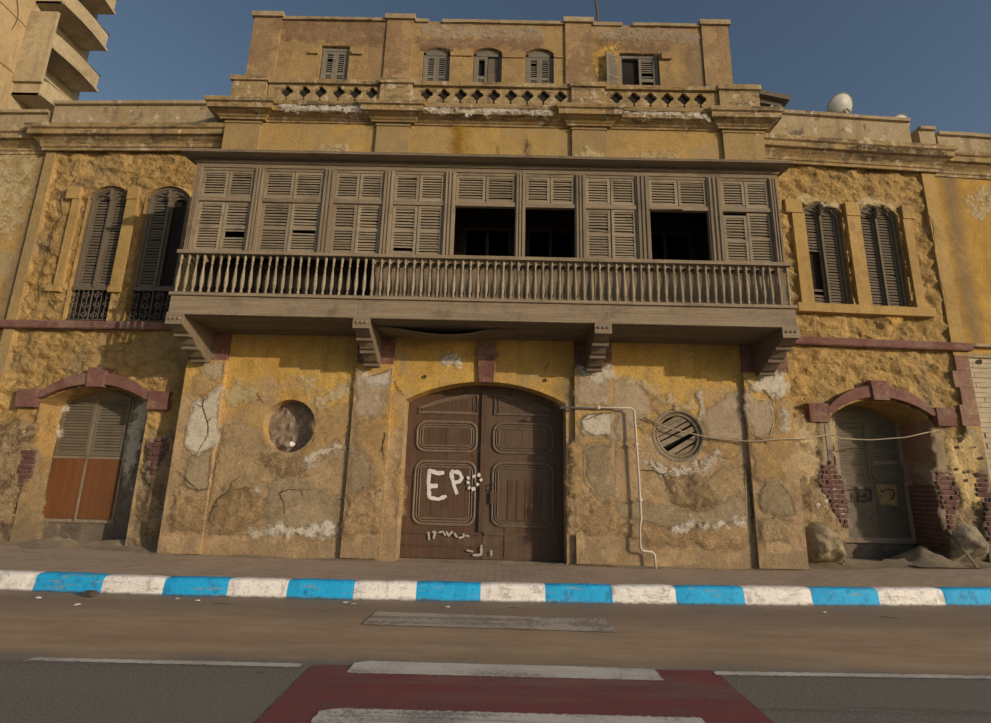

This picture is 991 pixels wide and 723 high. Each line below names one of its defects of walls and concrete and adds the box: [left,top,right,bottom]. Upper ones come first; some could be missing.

spalling [122,361,407,540]